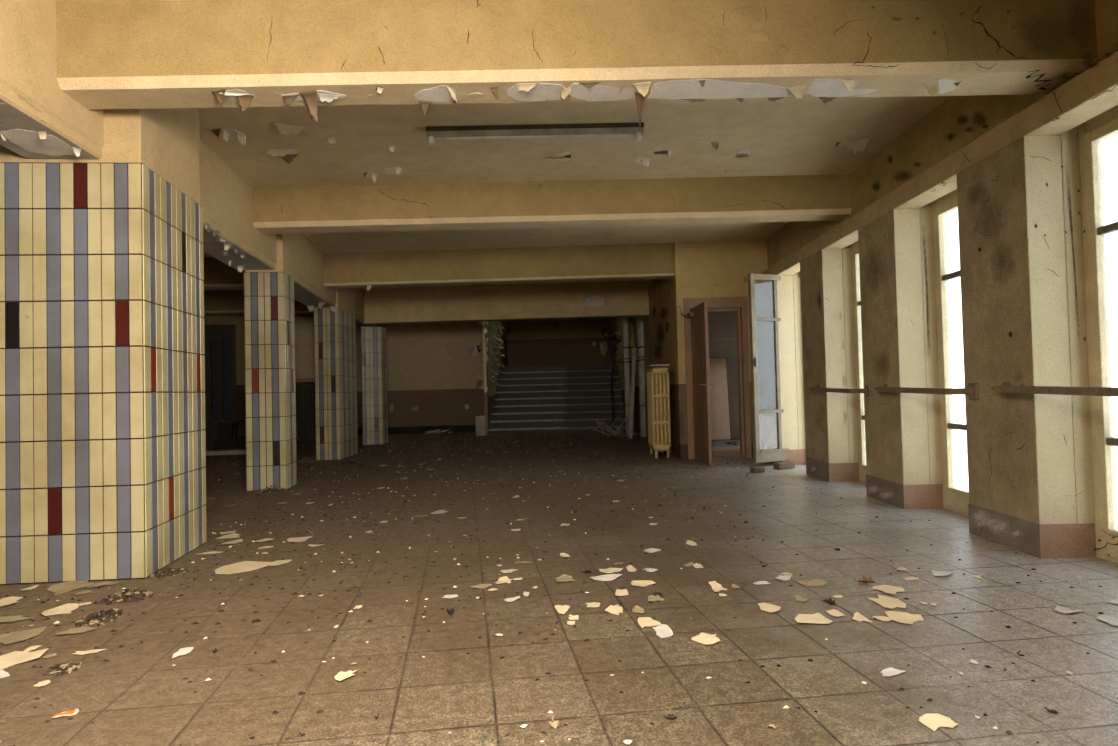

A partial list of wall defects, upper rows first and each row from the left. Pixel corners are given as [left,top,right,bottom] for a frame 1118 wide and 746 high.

peeling [210,127,246,146]
peeling [212,89,255,112]
peeling [263,90,355,164]
peeling [414,79,880,132]
crack [834,19,899,68]
peeling [922,78,962,98]
crack [942,4,1118,125]
peeling [203,223,247,272]